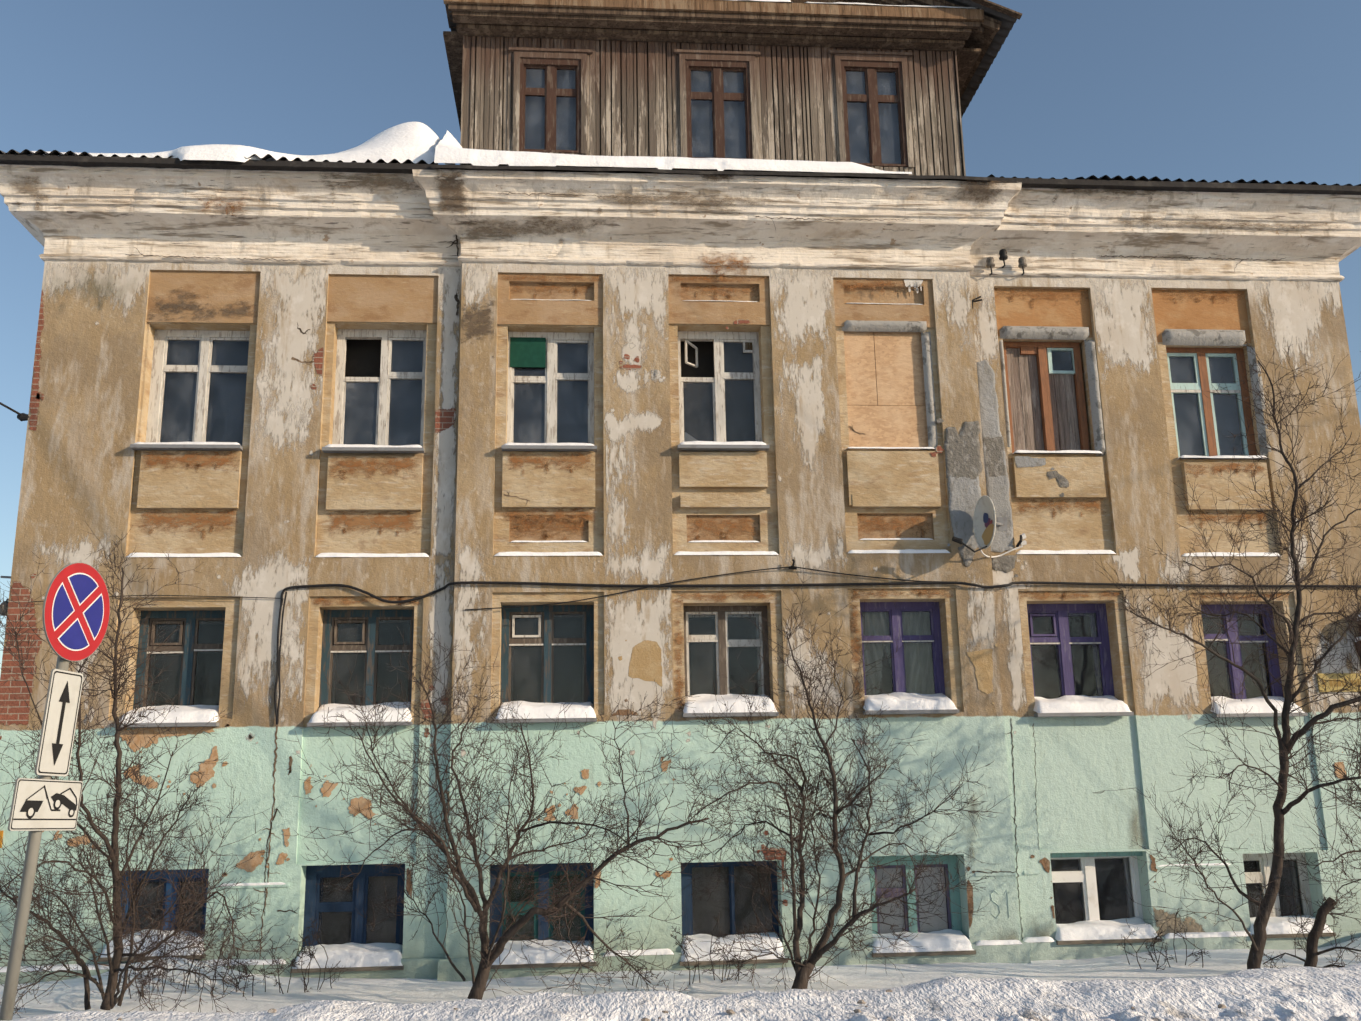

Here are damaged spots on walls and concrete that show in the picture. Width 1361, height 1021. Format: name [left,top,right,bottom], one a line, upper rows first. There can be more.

flaking render [437,169,470,213]
peeling [29,262,149,431]
flaking render [149,290,250,320]
peeling [255,265,327,461]
peeling [603,267,668,393]
peeling [758,269,839,471]
peeling [1254,280,1341,380]
peeling [217,551,311,722]
peeling [421,264,495,747]
peeling [593,408,673,729]
peeling [967,559,1030,712]
peeling [538,769,601,830]